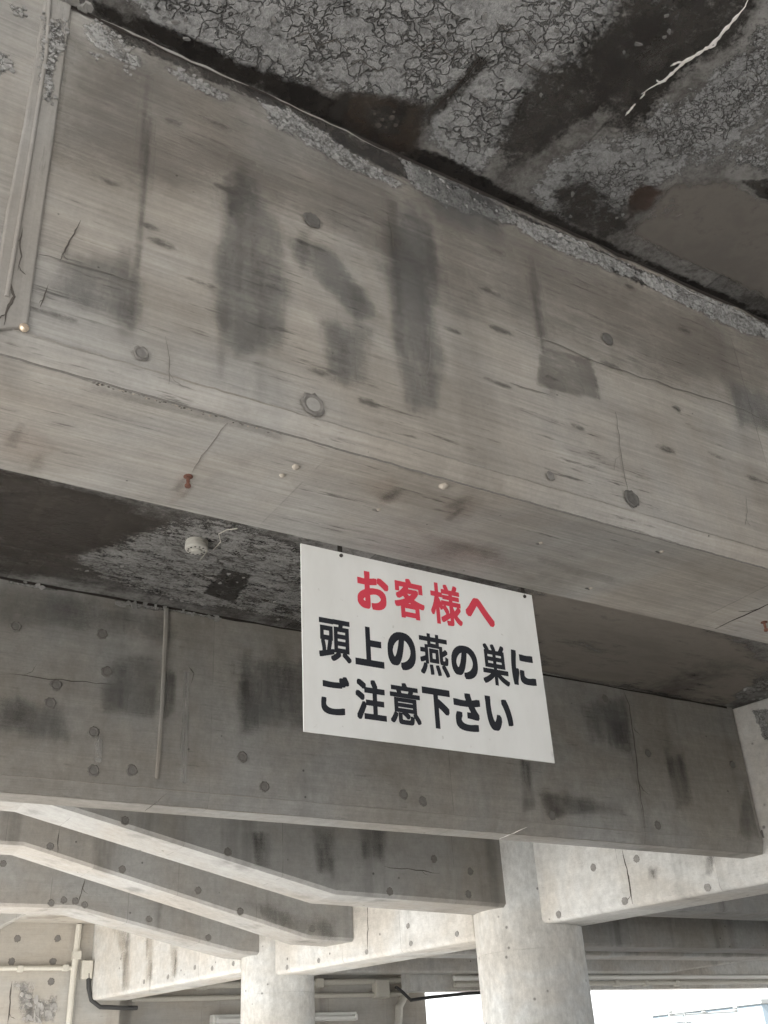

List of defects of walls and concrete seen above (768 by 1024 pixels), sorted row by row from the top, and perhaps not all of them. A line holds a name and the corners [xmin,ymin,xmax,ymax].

crack [71,0,768,324]
damp [93,0,768,334]
peeling [256,19,768,340]
damp [0,470,302,628]
crack [0,576,302,632]
crack [543,674,727,822]
crack [622,851,633,904]